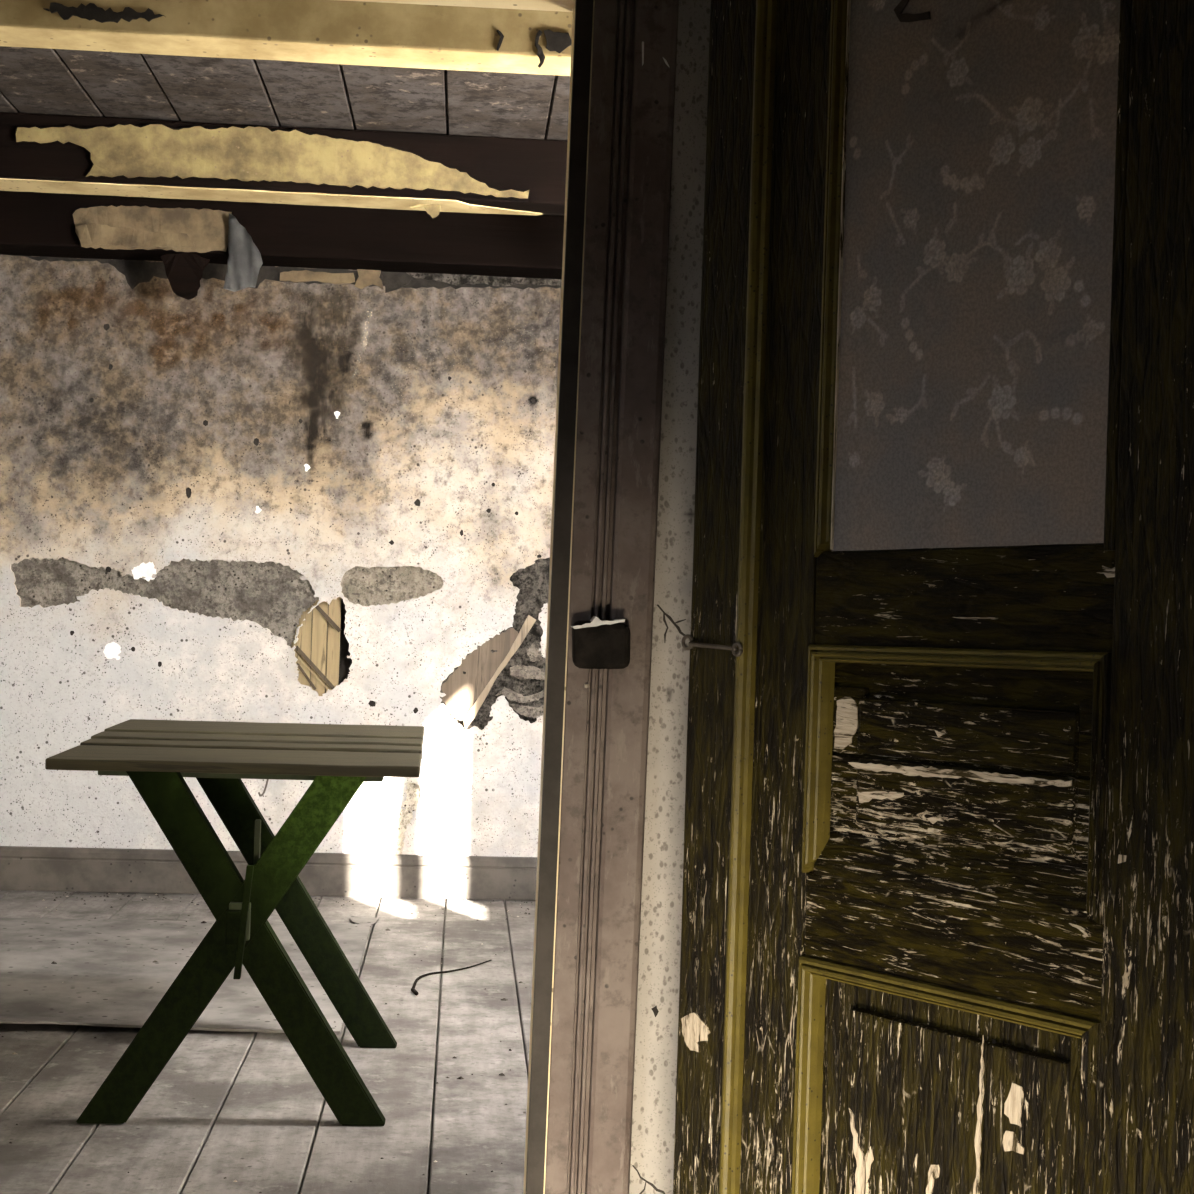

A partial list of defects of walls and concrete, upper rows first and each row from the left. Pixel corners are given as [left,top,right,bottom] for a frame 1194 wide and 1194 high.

peeling [43,2,164,23]
water stain [290,290,454,465]
water stain [502,318,560,371]
water stain [37,388,171,481]
flaking render [11,556,443,696]
flaking render [439,554,550,730]
peeling [834,697,1072,787]
peeling [681,1012,710,1053]
peeling [849,1108,874,1194]
peeling [926,1165,940,1194]
peeling [970,1035,985,1194]
peeling [1002,1083,1025,1154]